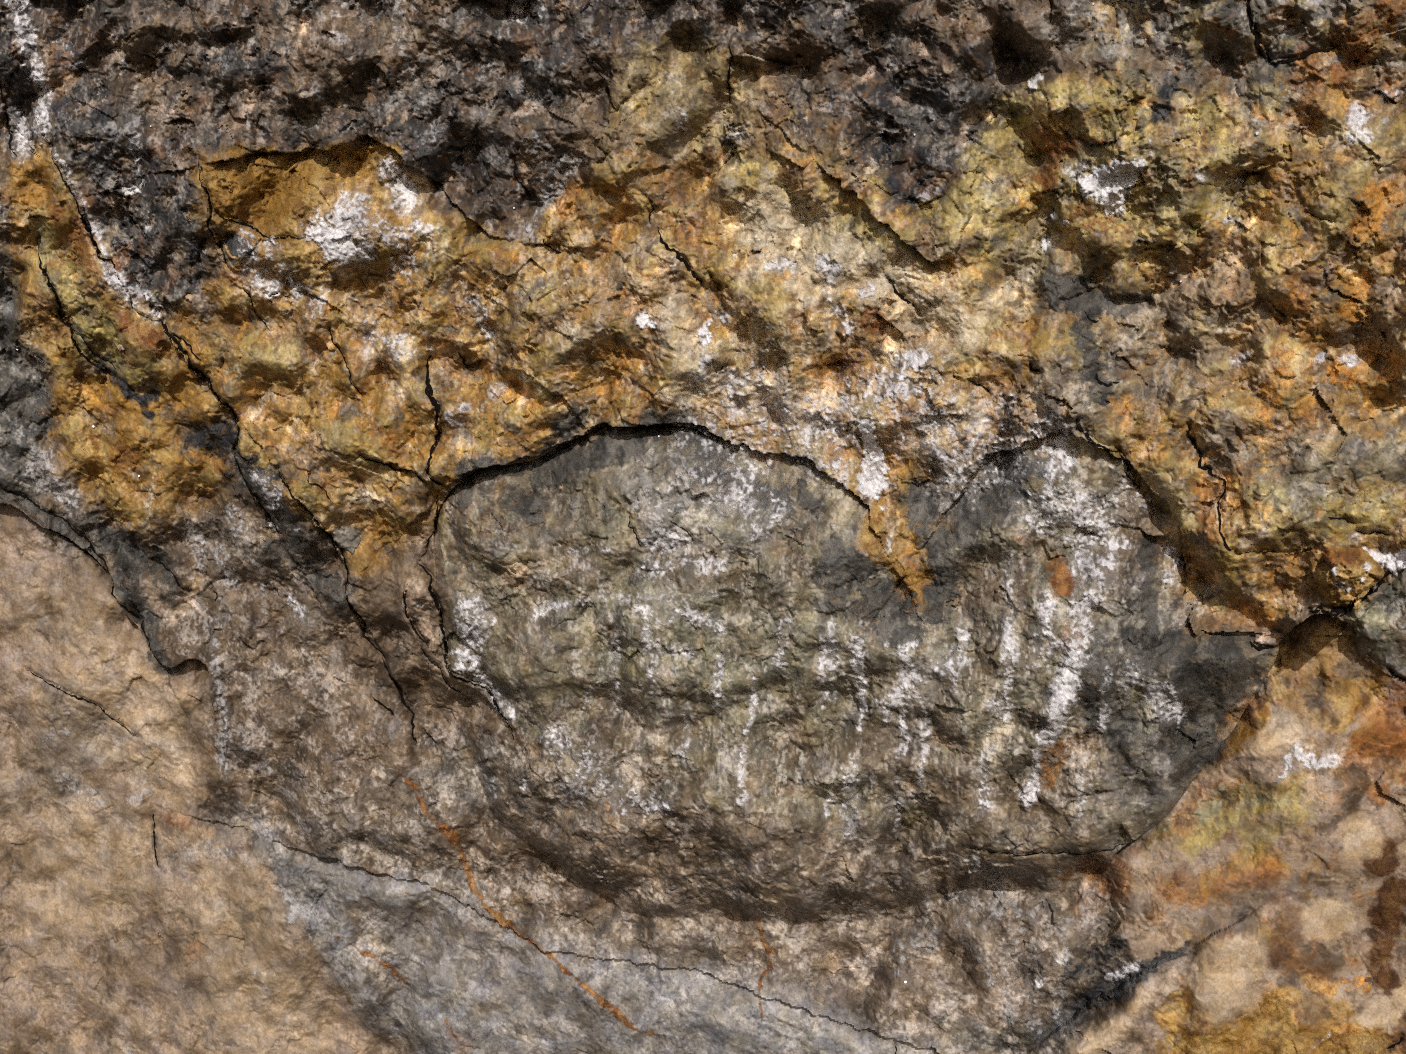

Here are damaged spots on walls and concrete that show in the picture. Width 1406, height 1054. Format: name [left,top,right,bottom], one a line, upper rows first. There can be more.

crack [37,238,118,377]
water stain [363,320,415,366]
water stain [464,287,495,352]
water stain [1040,271,1141,406]
crack [51,150,417,743]
crack [24,667,138,737]
crack [0,486,170,672]
crack [360,352,514,739]
water stain [451,313,1267,836]
crack [1250,641,1274,651]
crack [1310,569,1405,618]
crack [1329,517,1390,536]